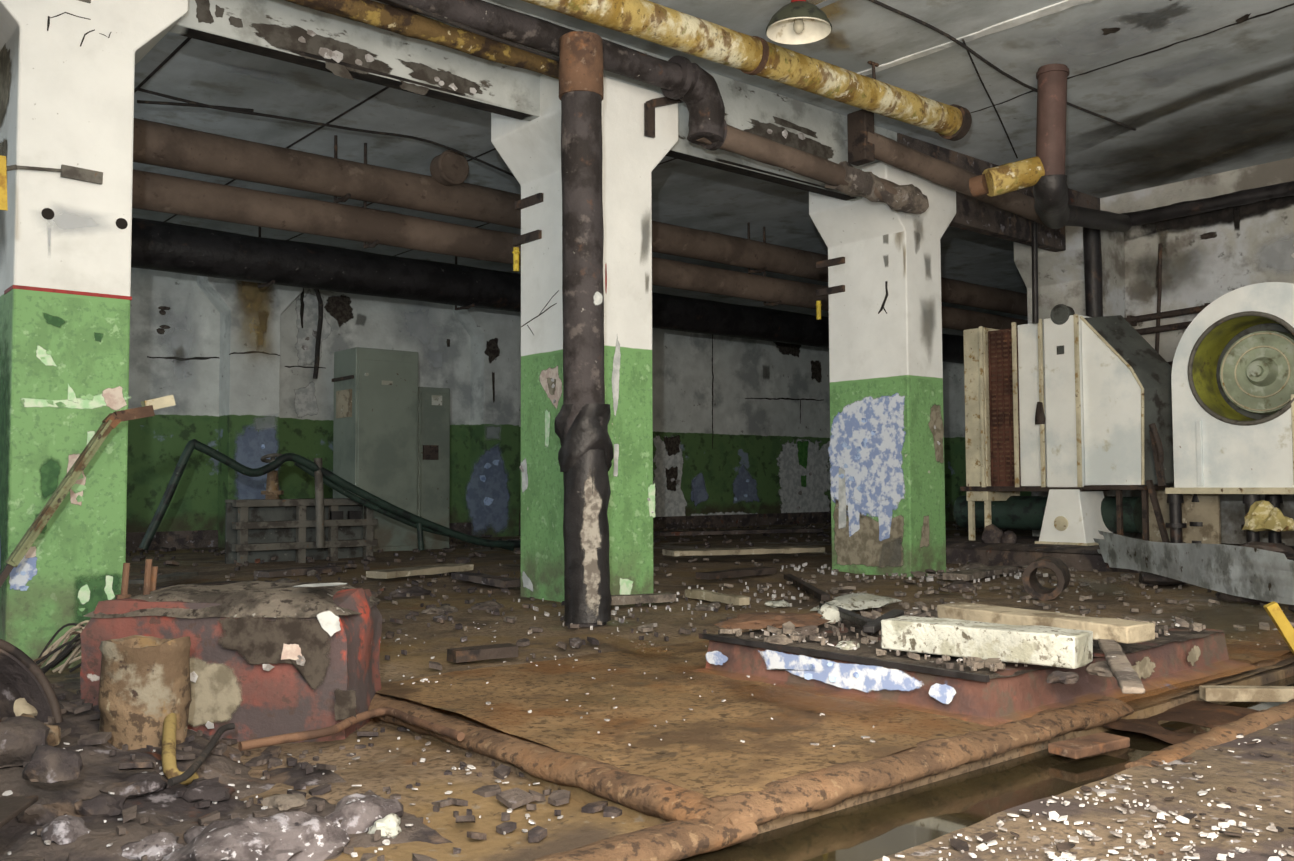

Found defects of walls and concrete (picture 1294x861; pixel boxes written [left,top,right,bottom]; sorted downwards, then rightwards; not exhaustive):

peeling [195,0,483,96]
water stain [1099,64,1294,134]
peeling [744,116,834,160]
water stain [1168,134,1281,172]
corrosion [239,281,269,347]
peeling [295,289,366,366]
peeling [22,384,129,410]
peeling [466,445,528,532]
peeling [647,435,759,517]
peeling [777,393,906,568]
peeling [0,514,47,591]
peeling [75,574,121,623]